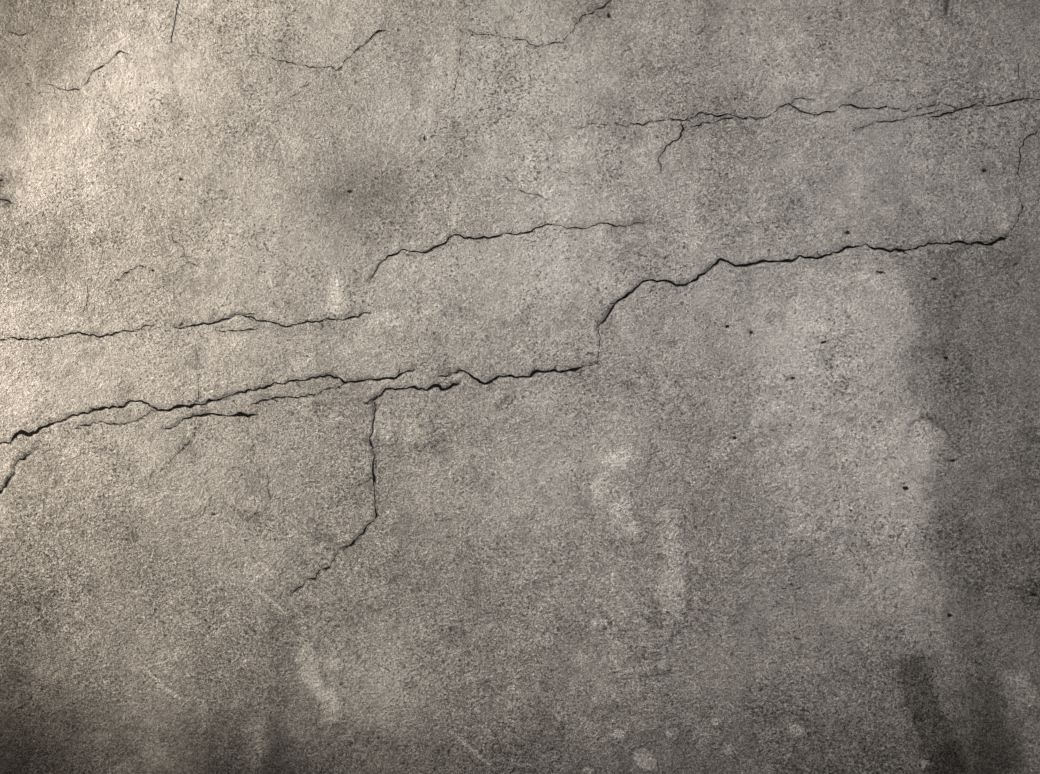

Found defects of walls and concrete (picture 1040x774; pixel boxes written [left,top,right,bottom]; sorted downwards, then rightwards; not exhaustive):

crack [272,30,386,104]
crack [453,0,611,98]
crack [578,63,1040,171]
crack [0,127,1040,595]